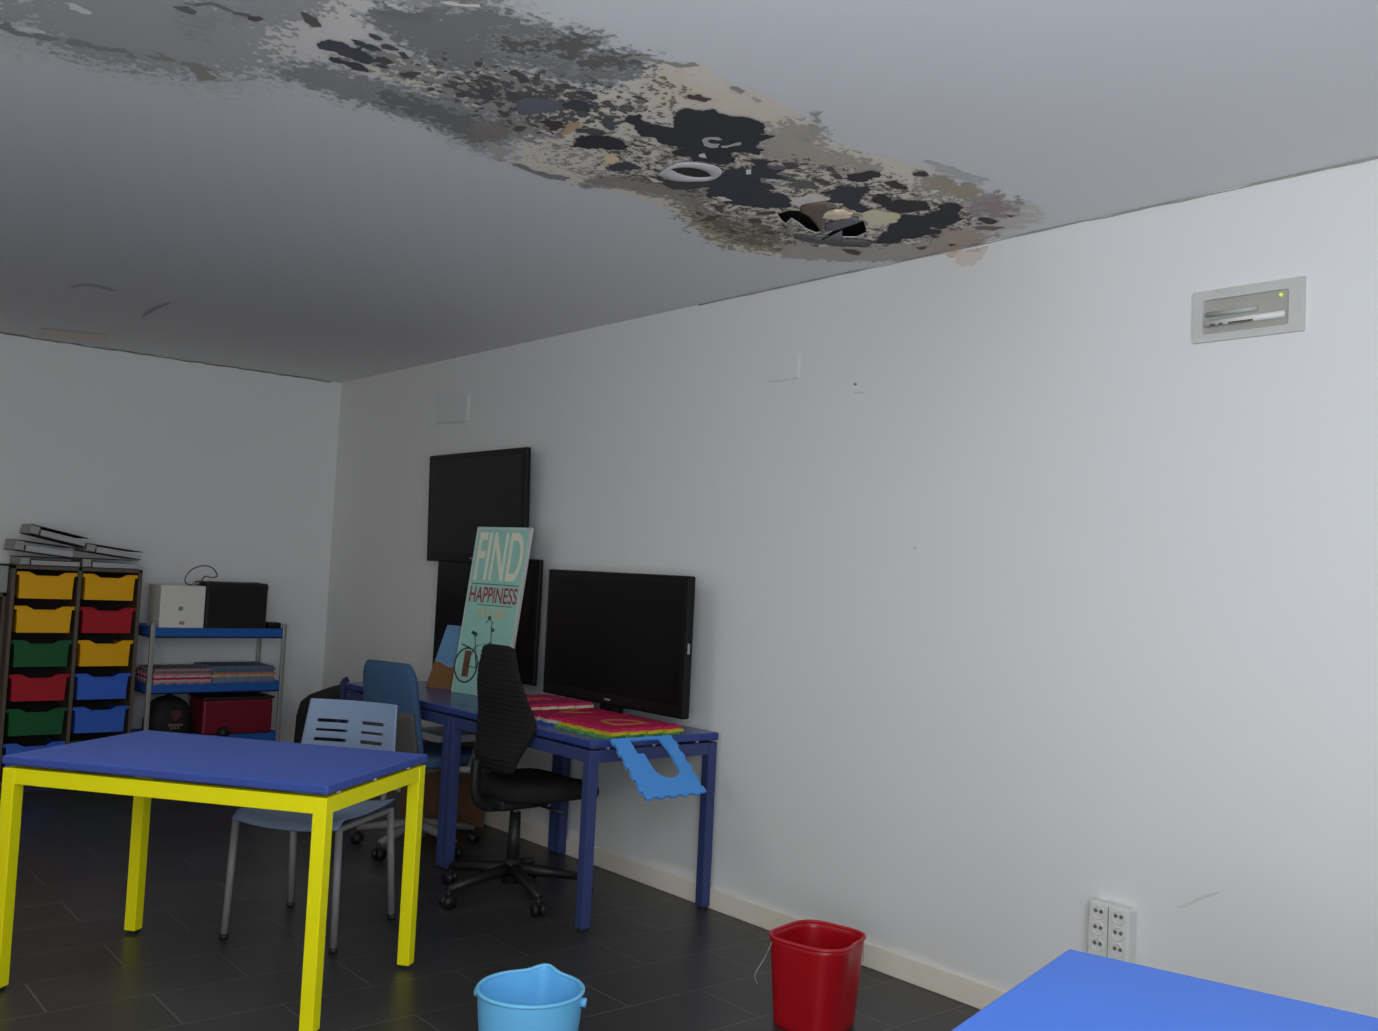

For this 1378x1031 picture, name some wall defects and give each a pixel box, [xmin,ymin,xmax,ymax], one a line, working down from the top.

peeling [64,3,93,15]
water stain [0,0,1057,263]
peeling [345,51,1009,257]